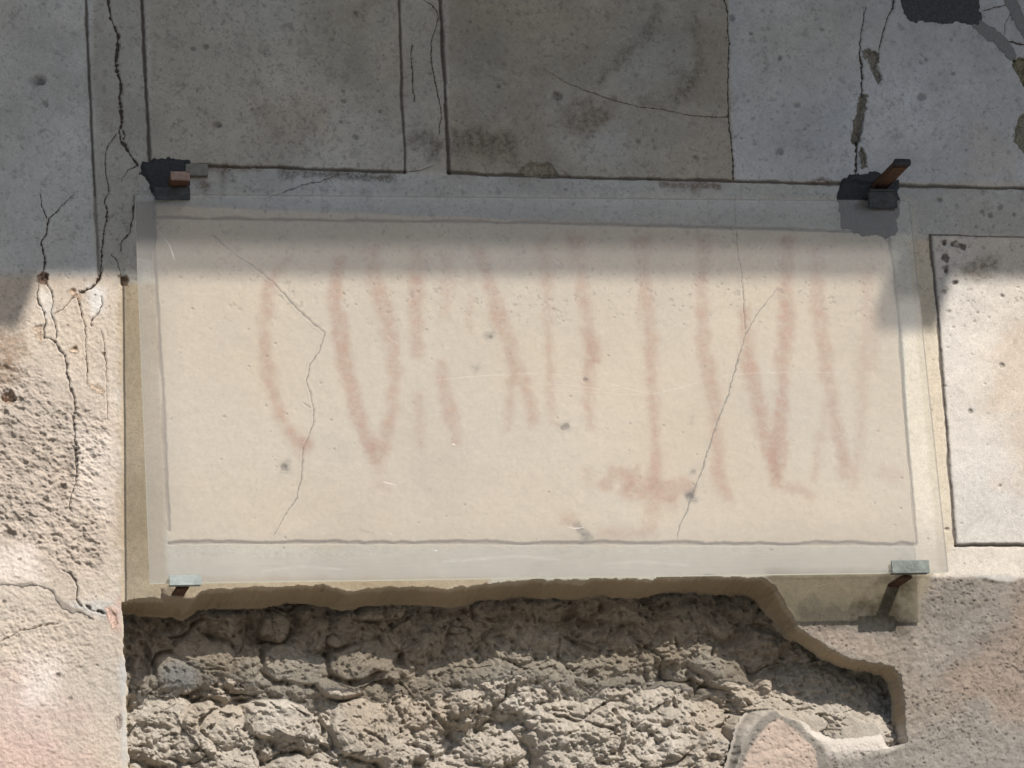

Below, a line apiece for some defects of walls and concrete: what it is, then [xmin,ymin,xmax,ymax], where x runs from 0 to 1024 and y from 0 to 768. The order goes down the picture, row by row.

crack [854,0,894,175]
crack [972,0,1024,62]
crack [37,0,138,510]
crack [214,236,326,535]
crack [546,0,778,540]
crack [0,570,104,642]